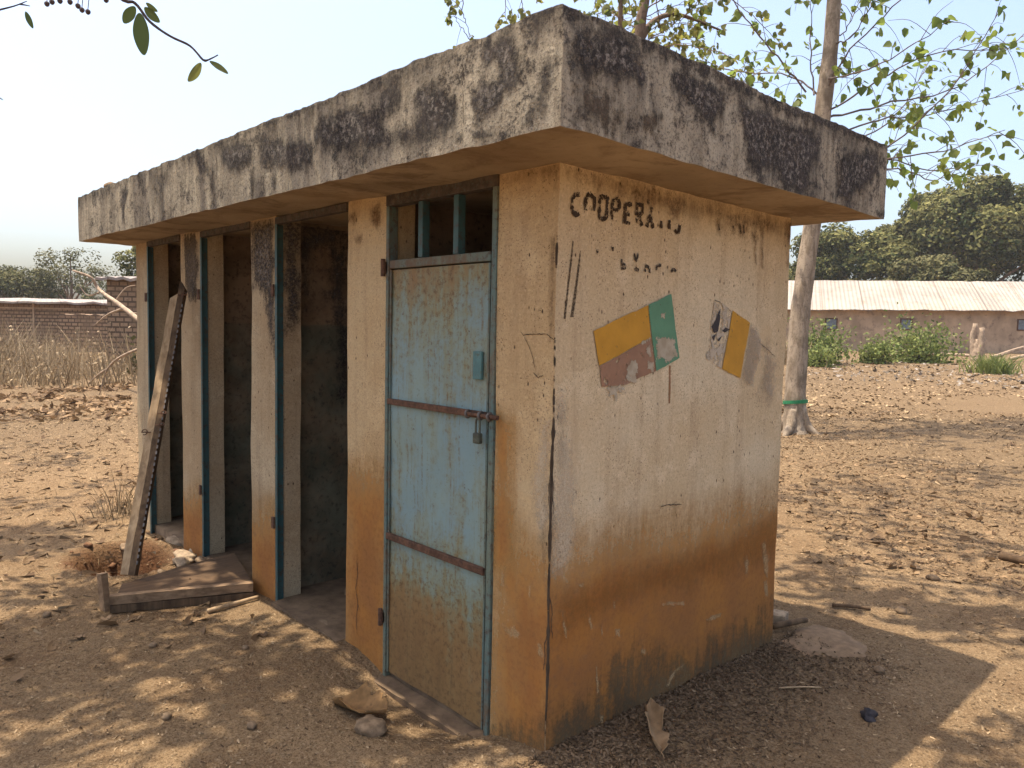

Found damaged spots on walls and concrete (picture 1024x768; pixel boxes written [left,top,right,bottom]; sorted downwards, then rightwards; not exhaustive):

water stain [169,53,457,196]
water stain [456,22,521,142]
water stain [523,5,888,199]
water stain [79,182,128,219]
water stain [251,214,355,403]
crack [552,237,560,268]
peeling [606,337,678,401]
crack [522,327,556,734]
water stain [500,608,773,751]